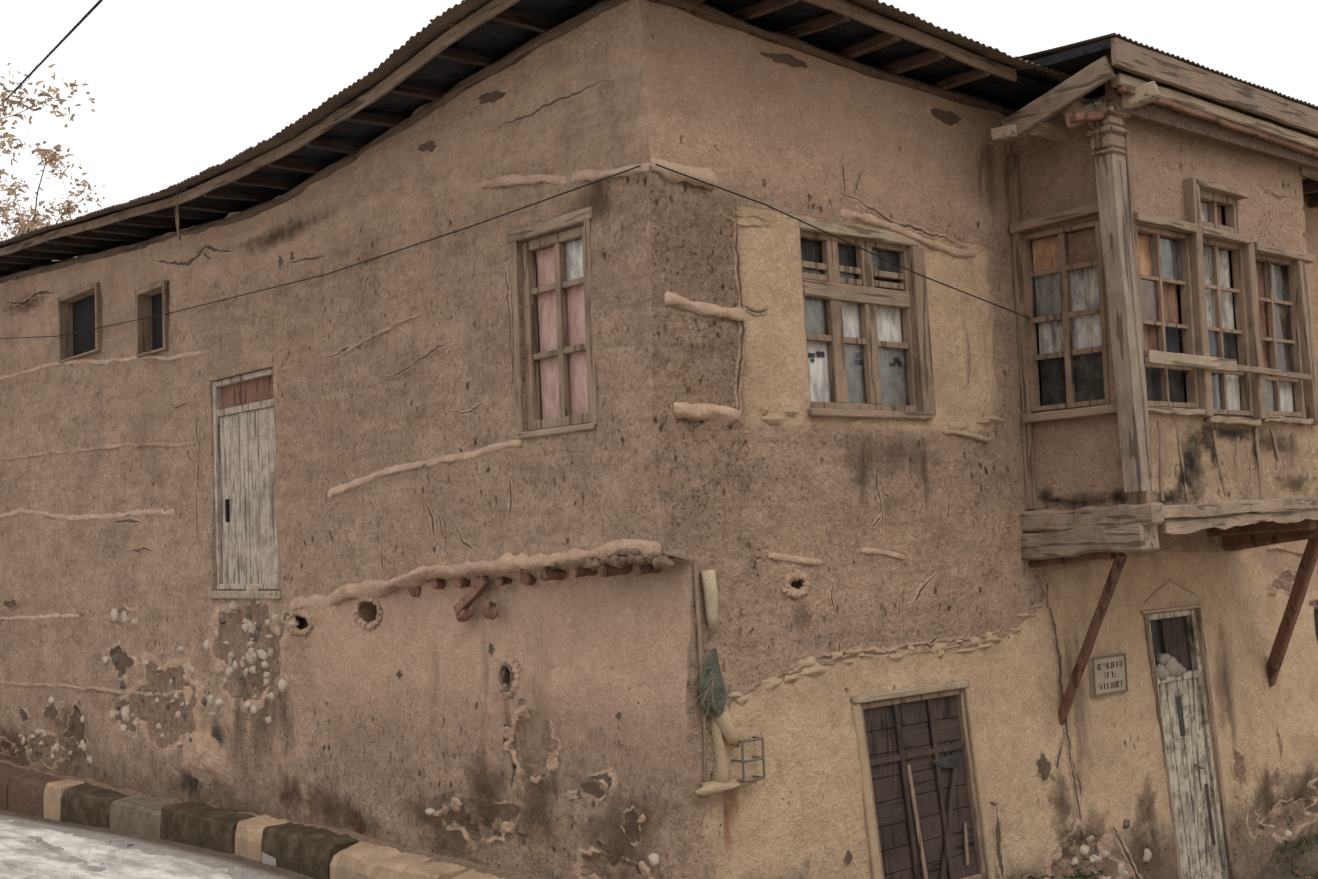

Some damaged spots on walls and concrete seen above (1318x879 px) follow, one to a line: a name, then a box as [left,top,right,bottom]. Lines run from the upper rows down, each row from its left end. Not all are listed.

crack [480,77,611,139]
crack [152,242,235,268]
leakage [1157,428,1304,503]
crack [907,565,937,608]
crack [788,578,1001,674]
spalling [102,586,314,758]
spalling [0,696,93,772]
spalling [488,641,563,787]
spalling [425,793,528,848]
spalling [566,768,618,810]
spalling [573,804,660,879]
spalling [1231,744,1318,843]